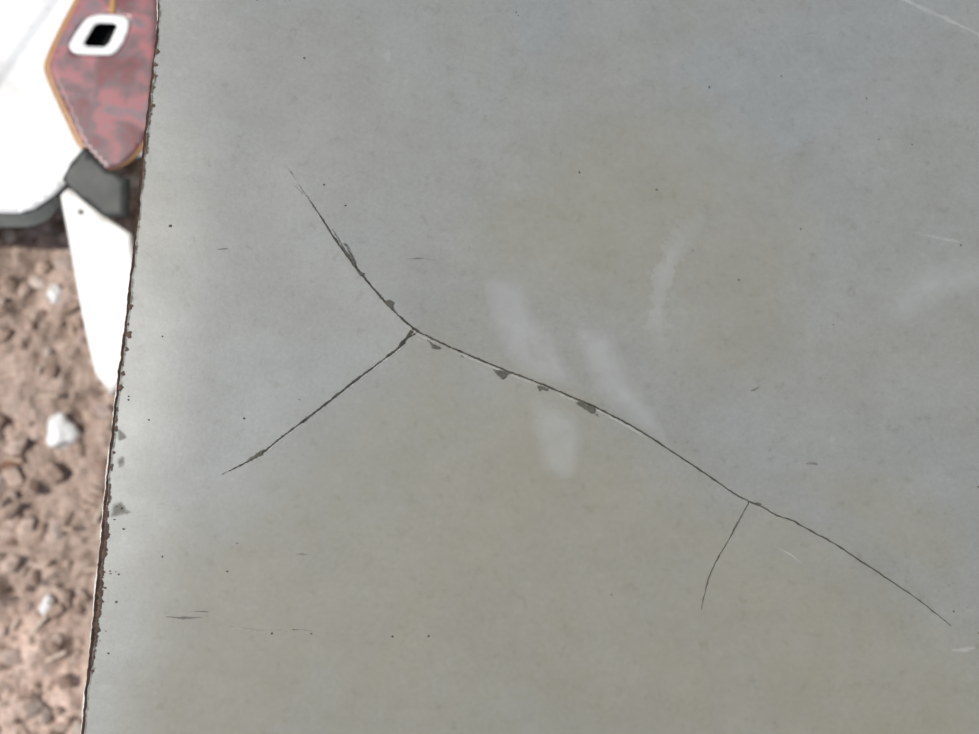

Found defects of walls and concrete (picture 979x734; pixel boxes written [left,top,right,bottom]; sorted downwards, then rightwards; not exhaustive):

crack [221,187,951,626]